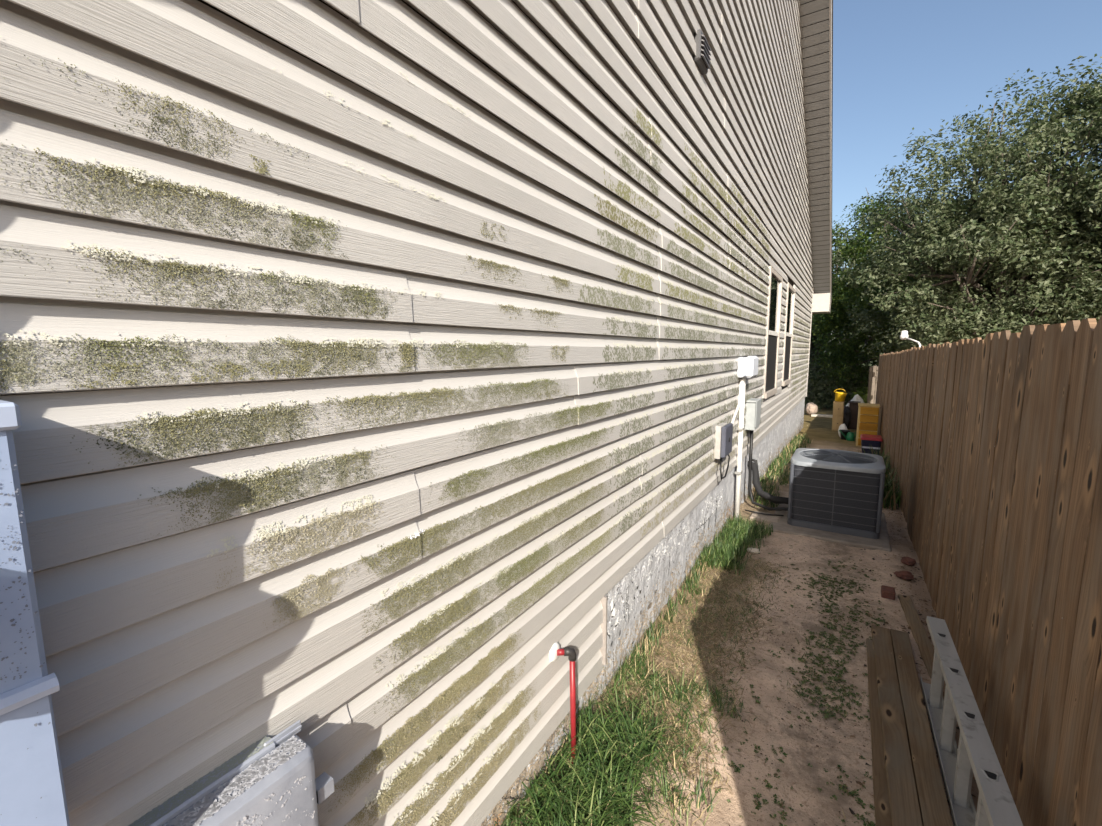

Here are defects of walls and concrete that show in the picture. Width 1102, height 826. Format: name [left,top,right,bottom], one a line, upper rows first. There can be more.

leakage [220,222,326,252]
leakage [308,290,389,319]
mould [73,353,398,389]
mould [96,409,318,463]
leakage [239,456,369,513]
leakage [536,666,606,766]